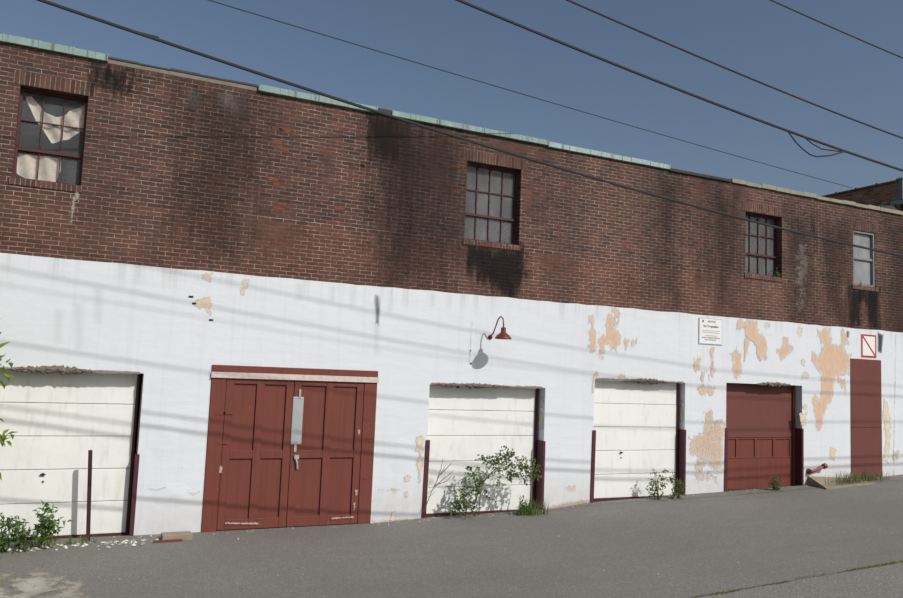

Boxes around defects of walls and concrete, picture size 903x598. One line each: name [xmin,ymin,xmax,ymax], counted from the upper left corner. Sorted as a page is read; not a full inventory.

water stain [89,63,136,94]
water stain [467,242,527,298]
peeling [194,296,212,316]
peeling [587,303,637,359]
spalling [592,371,684,422]
peeling [693,347,716,397]
peeling [731,319,793,380]
peeling [795,327,852,431]
water stain [847,289,883,352]
peeling [391,435,424,498]
peeling [688,409,726,484]